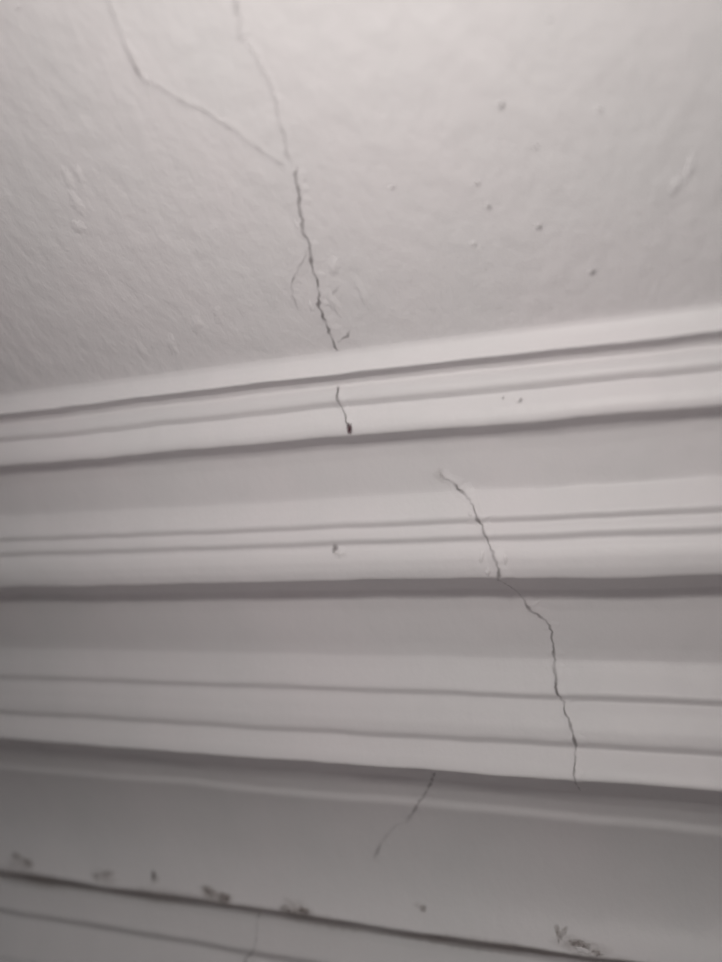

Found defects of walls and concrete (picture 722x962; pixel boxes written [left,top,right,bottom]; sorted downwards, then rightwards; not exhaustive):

crack [101,0,356,352]
crack [331,383,358,434]
crack [438,468,588,791]
crack [370,772,444,864]